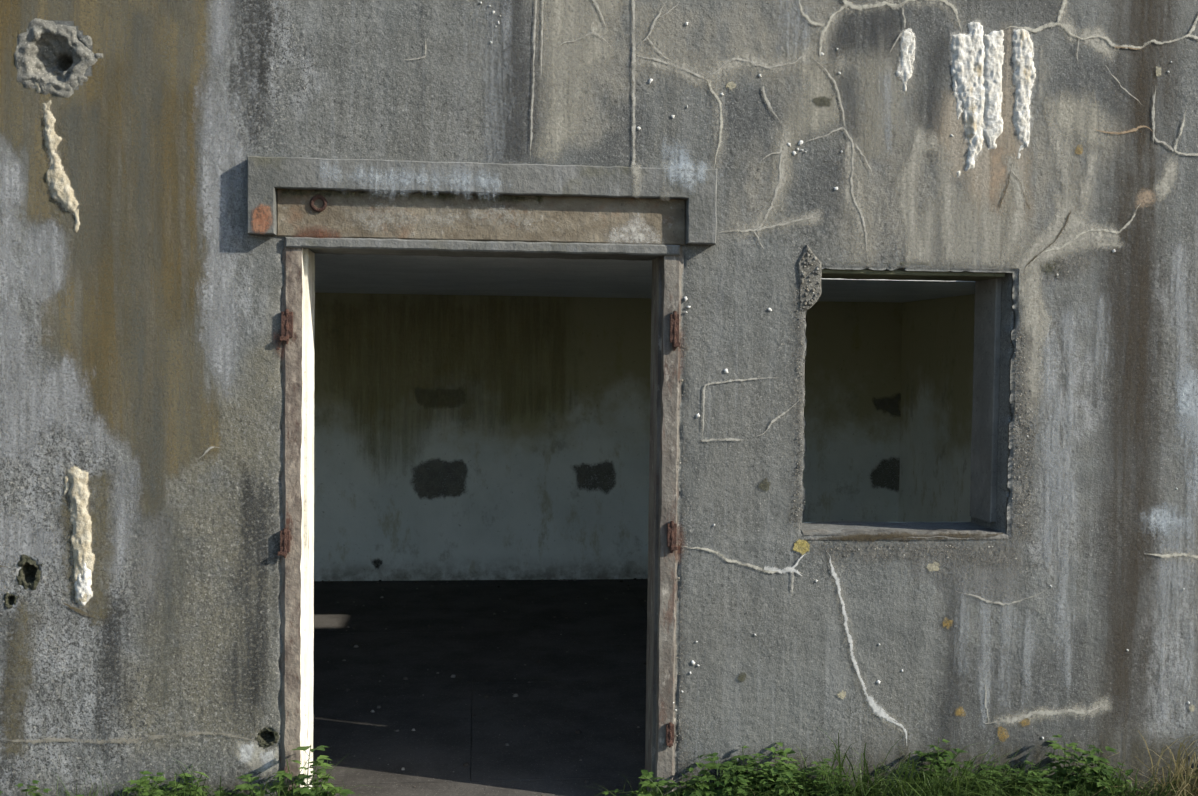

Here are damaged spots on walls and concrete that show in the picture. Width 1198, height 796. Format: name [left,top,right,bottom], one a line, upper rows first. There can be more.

spalling [14,18,103,98]
water stain [230,0,273,143]
crack [553,0,962,256]
crack [1003,0,1198,156]
water stain [0,0,221,522]
rust [252,204,272,232]
water stain [636,0,1176,427]
crack [1024,202,1142,273]
crack [1144,552,1198,560]
crack [683,531,1003,743]
water stain [945,550,1138,739]
crack [985,685,1105,724]